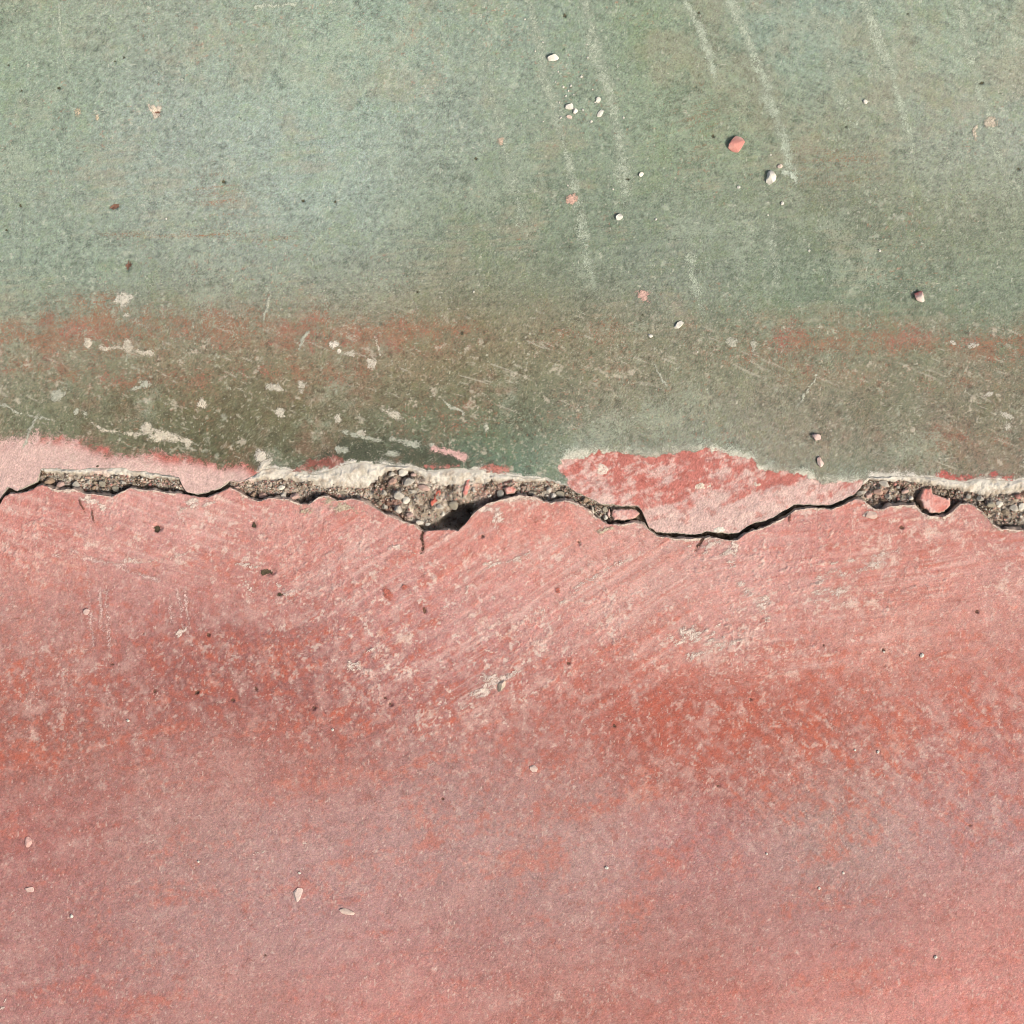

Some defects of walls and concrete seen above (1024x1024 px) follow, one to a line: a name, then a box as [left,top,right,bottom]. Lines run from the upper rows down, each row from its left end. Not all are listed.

crack [0,480,40,503]
crack [187,482,231,497]
peeling [0,424,1024,542]
crack [617,491,858,551]